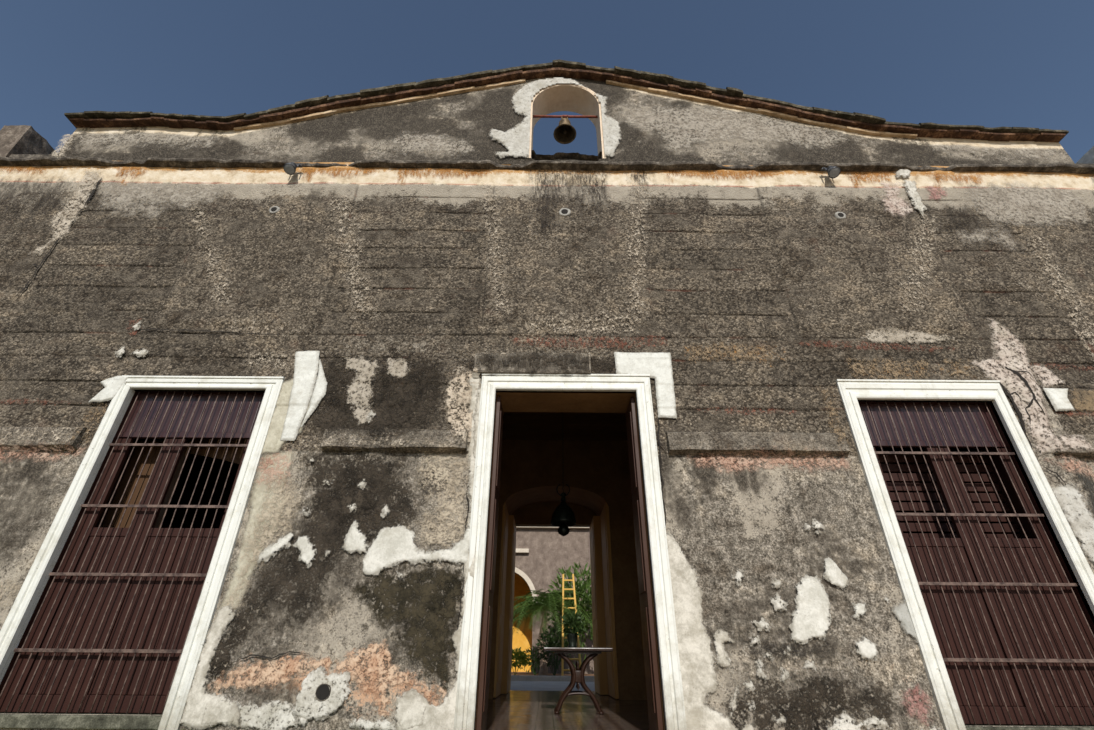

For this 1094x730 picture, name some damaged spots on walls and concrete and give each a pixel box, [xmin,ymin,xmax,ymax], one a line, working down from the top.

corrosion [305,168,374,181]
corrosion [398,168,487,181]
corrosion [666,170,772,179]
corrosion [851,172,890,188]
peeling [881,169,936,312]
flaking render [346,356,407,424]
crack [1000,366,1076,487]
peeling [225,453,311,609]
leakage [207,355,450,681]
leakage [1074,467,1094,510]
leakage [354,566,464,691]
peeling [208,641,447,716]